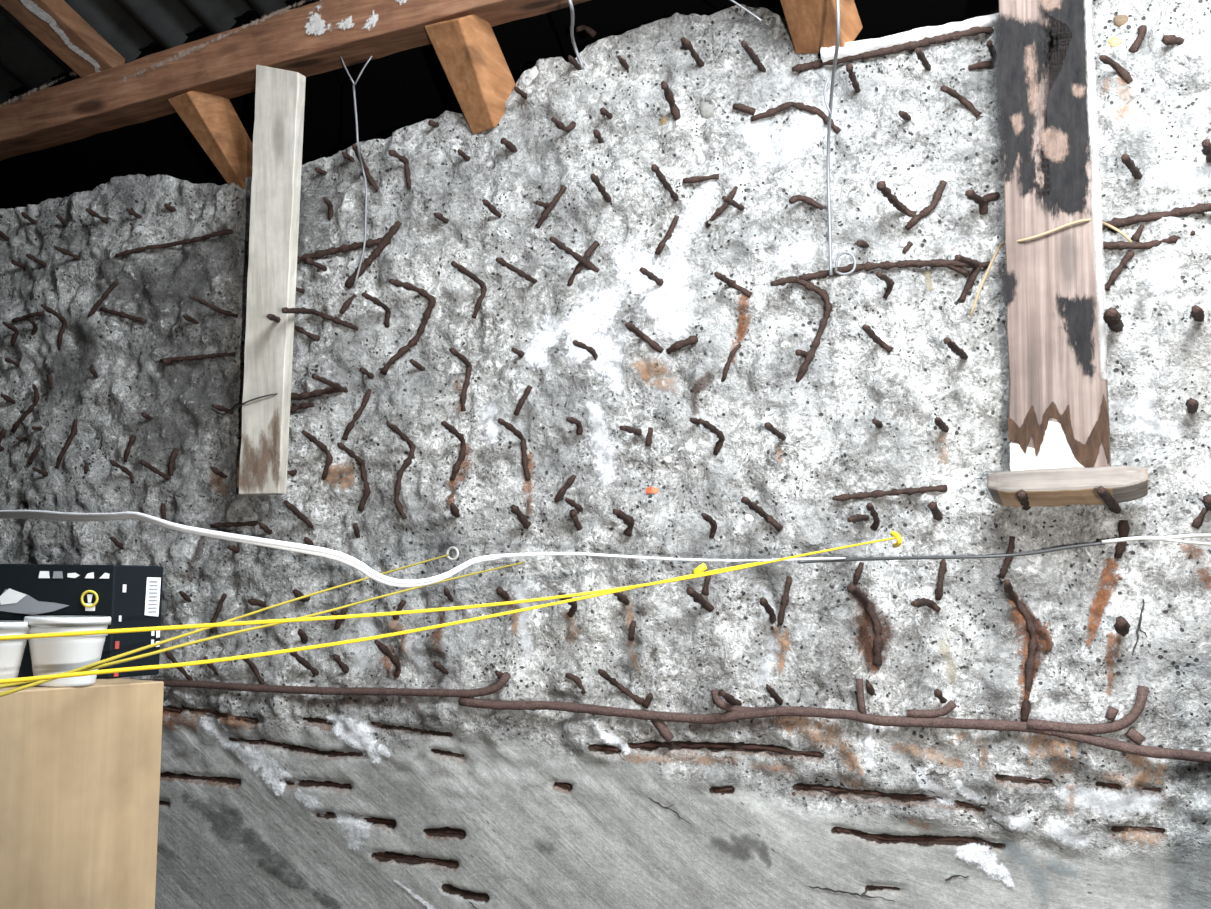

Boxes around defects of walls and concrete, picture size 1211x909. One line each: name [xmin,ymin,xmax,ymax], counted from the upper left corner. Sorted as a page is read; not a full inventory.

spalling [792,26,996,93]
spalling [770,180,990,382]
corrosion [731,296,750,362]
peeling [1010,421,1084,471]
spalling [123,536,1211,764]
corrosion [848,584,891,671]
corrosion [1007,593,1052,704]
corrosion [1086,558,1122,695]
leakage [326,712,390,763]
leakage [200,713,372,850]
crack [809,885,894,901]
leakage [956,843,1014,887]